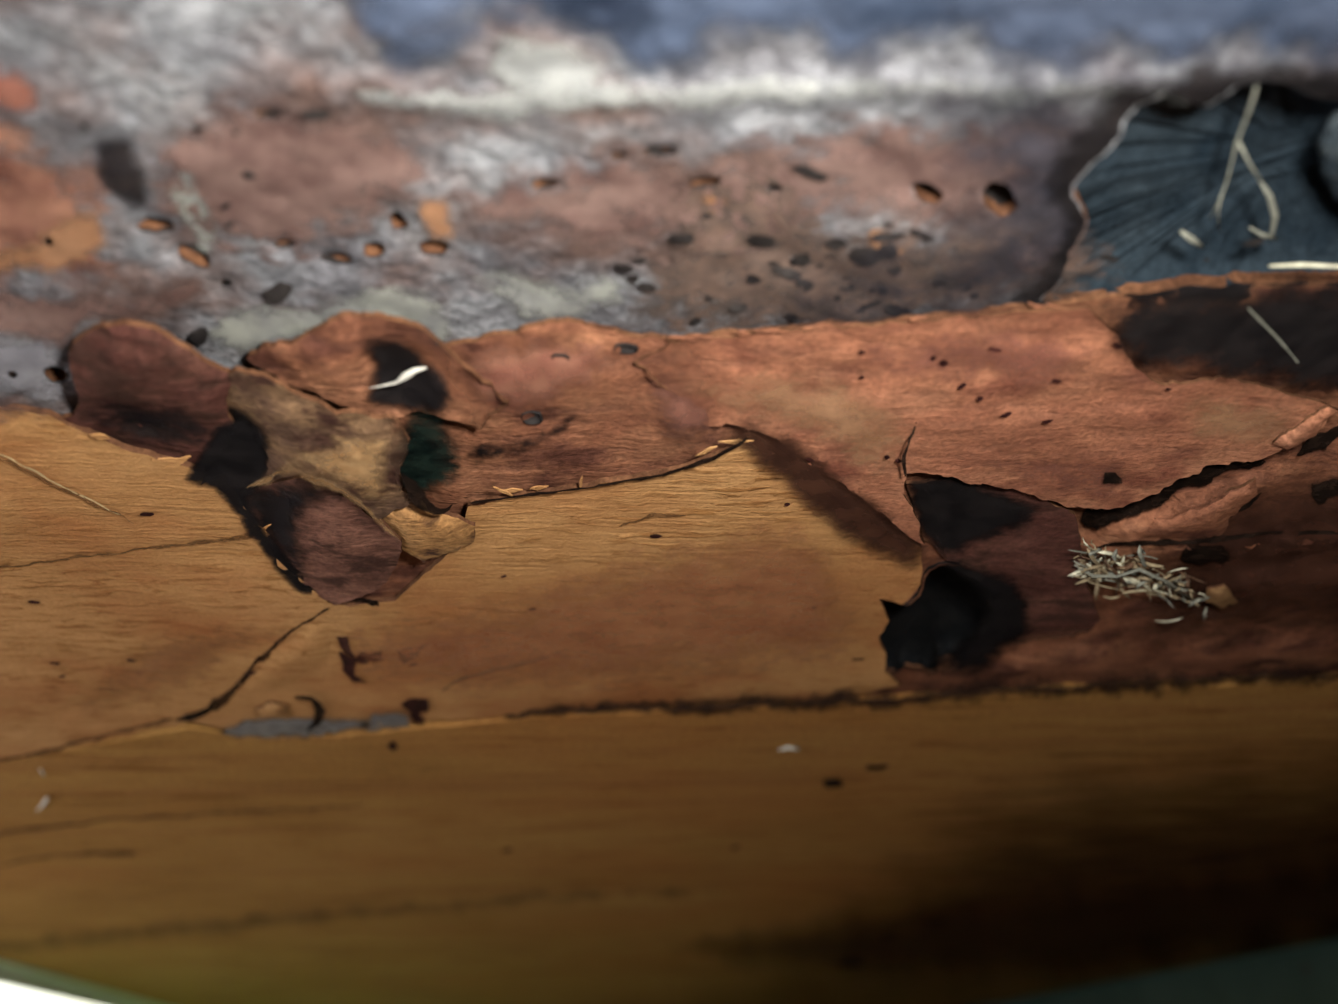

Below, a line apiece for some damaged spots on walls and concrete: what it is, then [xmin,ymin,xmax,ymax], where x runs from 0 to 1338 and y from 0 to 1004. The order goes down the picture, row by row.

leakage [97,141,147,207]
leakage [353,0,1338,331]
leakage [172,173,216,250]
spalling [189,327,208,346]
leakage [210,287,450,351]
leakage [0,340,66,414]
peeling [1205,584,1238,608]
crack [0,598,379,762]
peeling [222,701,410,738]
crack [0,804,363,866]